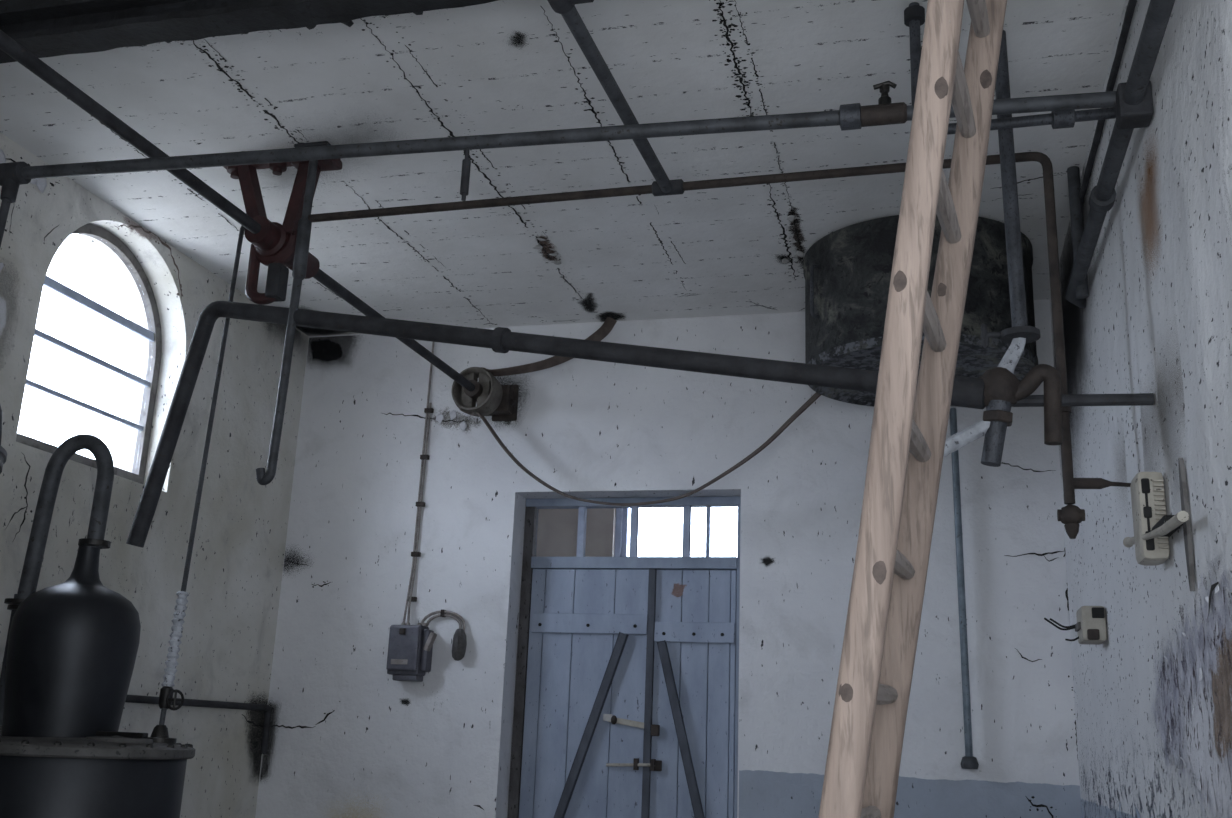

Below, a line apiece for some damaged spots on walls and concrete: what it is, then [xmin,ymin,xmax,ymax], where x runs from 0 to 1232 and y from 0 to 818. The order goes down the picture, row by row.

crack [0,149,63,195]
crack [341,17,597,325]
mould [244,691,282,784]
crack [242,701,340,729]
peeling [1079,540,1232,818]